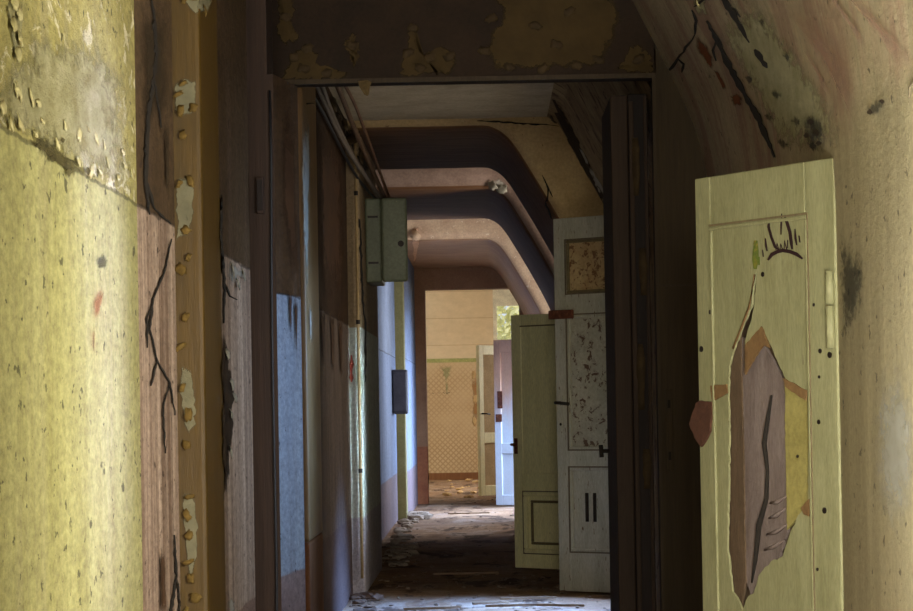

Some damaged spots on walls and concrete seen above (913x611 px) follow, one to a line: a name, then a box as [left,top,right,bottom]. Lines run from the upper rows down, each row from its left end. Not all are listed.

peeling [0,0,134,182]
peeling [477,0,619,75]
crack [668,0,775,158]
water stain [727,12,838,151]
peeling [179,368,196,451]
crack [169,535,181,611]
peeling [182,494,202,611]